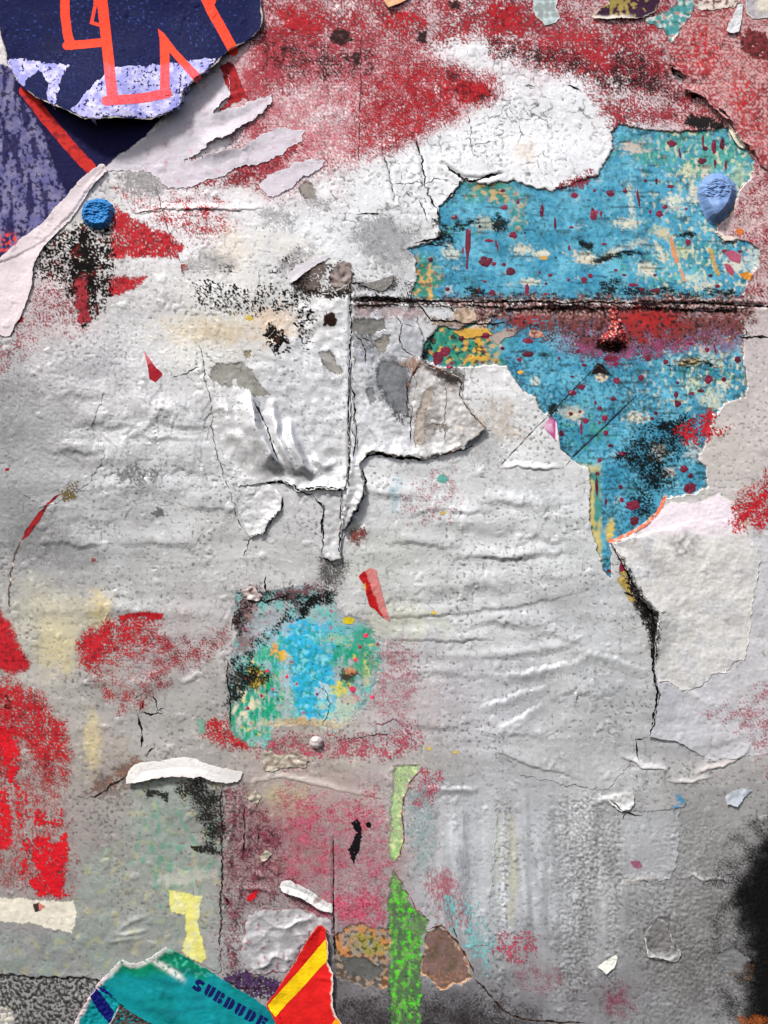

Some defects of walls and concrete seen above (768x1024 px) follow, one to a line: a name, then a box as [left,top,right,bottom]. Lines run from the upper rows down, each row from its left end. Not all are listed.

peeling [299,180,317,200]
crack [173,275,768,561]
peeling [407,124,761,578]
crack [611,545,667,759]
peeling [630,750,740,784]
peeling [726,788,752,807]